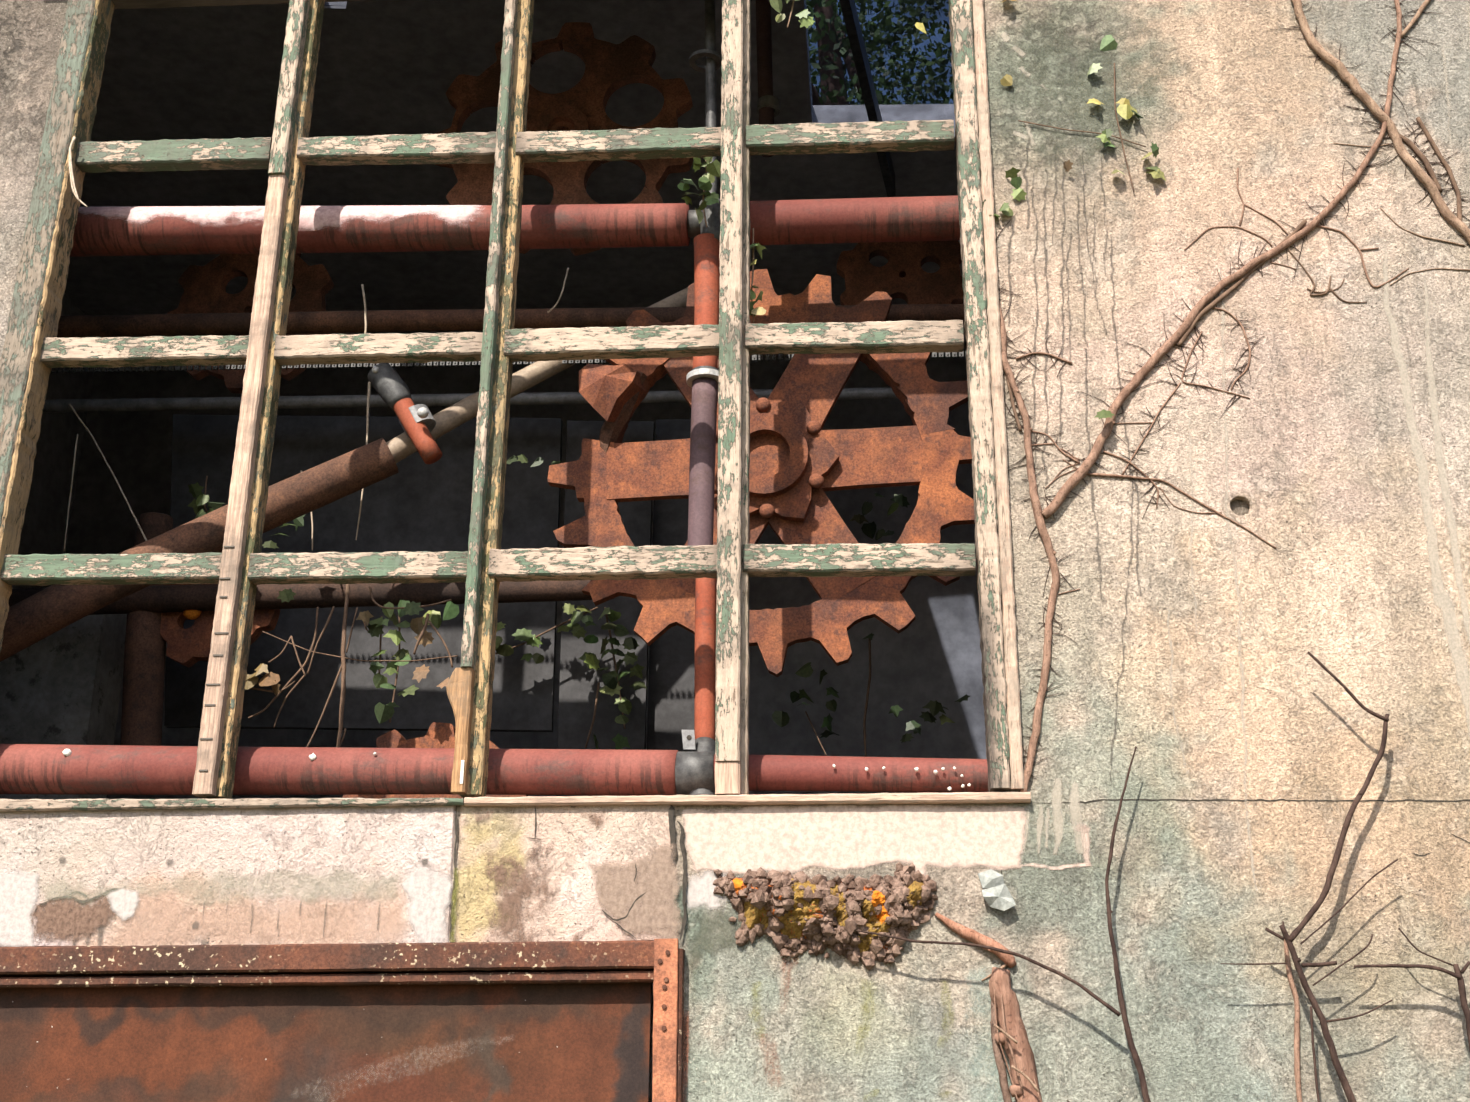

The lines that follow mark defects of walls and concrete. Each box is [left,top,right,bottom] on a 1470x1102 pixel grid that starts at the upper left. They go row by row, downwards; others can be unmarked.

crack [998,799,1470,856]
peeling [591,804,1091,939]
peeling [0,872,138,947]